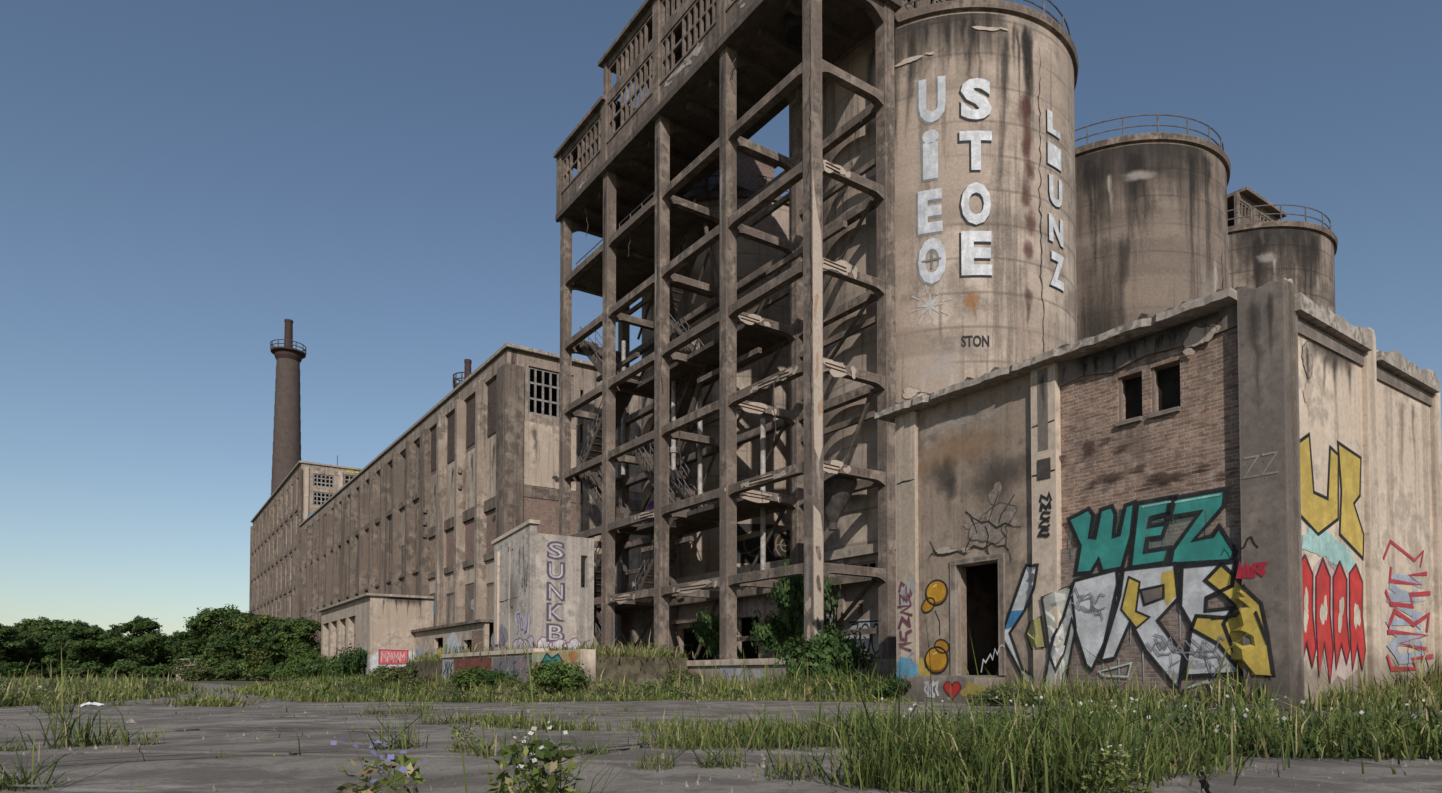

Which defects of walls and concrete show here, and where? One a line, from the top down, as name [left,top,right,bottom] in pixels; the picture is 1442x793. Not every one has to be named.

leakage [894,13,1033,103]
corrosion [1023,98,1034,256]
leakage [1078,143,1210,209]
leakage [1240,228,1318,287]
crack [929,469,1055,561]